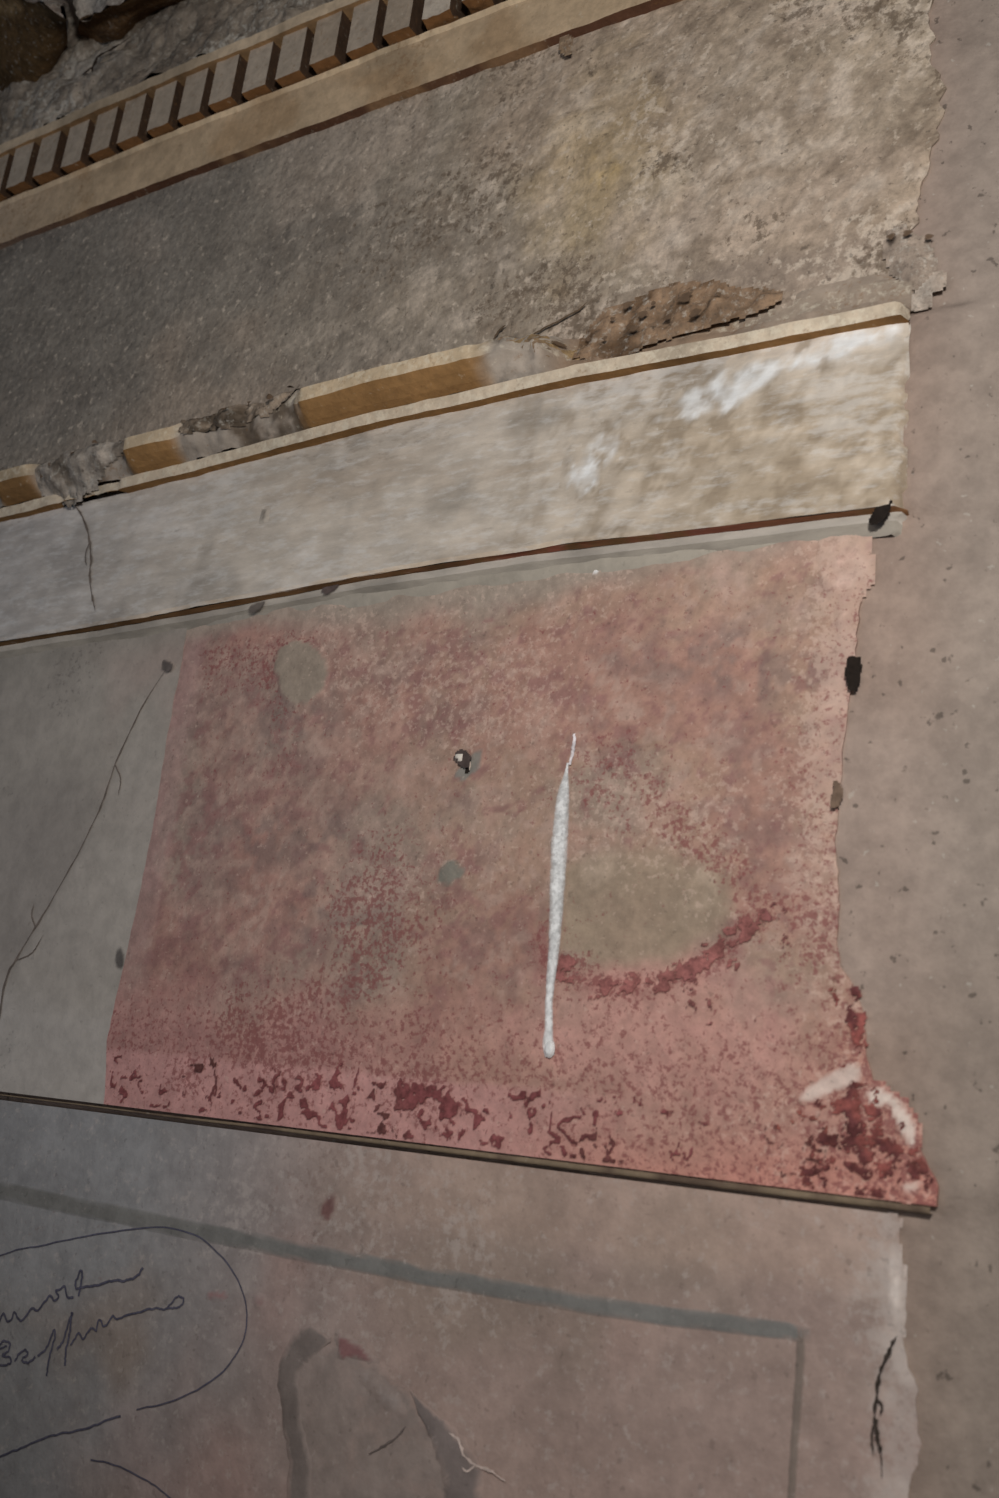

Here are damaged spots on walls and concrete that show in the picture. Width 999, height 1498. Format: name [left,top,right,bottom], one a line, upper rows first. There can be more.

spalling [497,279,783,362]
crack [75,505,95,608]
crack [0,672,164,1016]
peeling [110,1055,504,1149]
peeling [508,1089,642,1163]
crack [871,1336,897,1475]